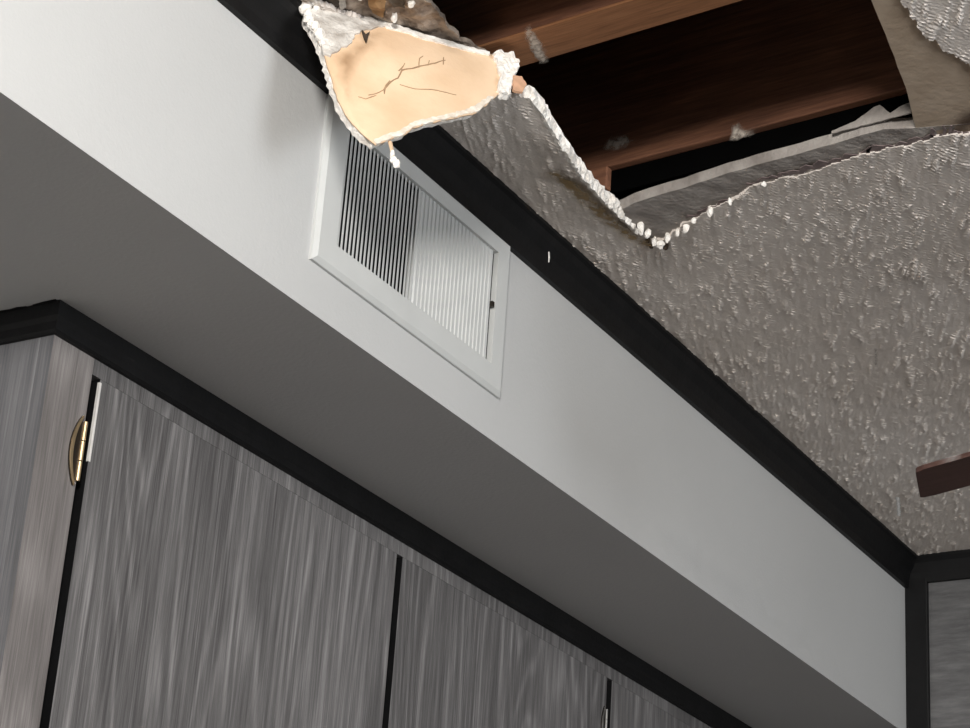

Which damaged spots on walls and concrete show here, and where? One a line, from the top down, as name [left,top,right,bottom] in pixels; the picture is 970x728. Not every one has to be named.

crack [358,56,456,99]
spalling [617,0,970,251]